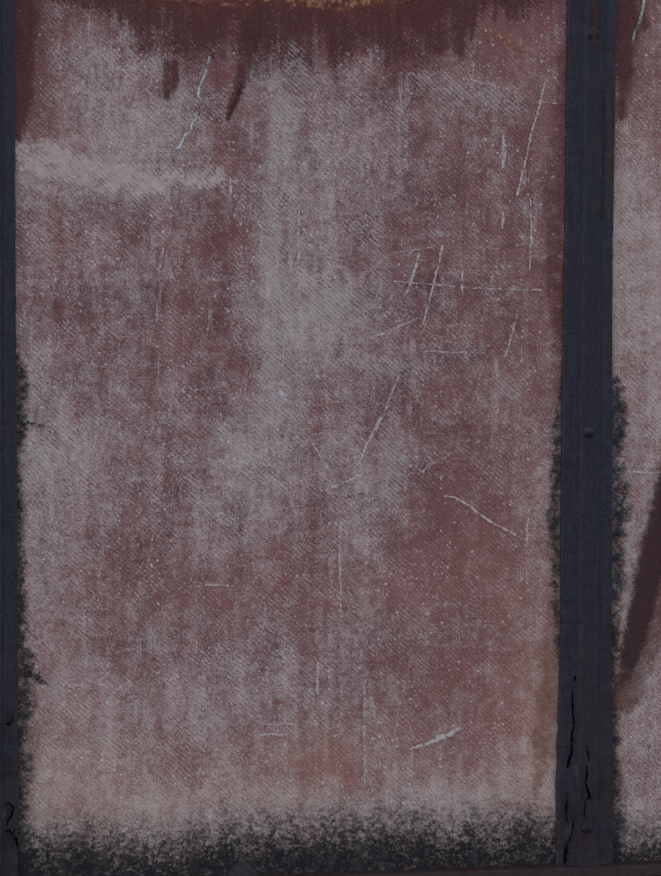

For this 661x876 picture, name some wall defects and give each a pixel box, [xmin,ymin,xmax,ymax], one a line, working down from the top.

corrosion [51,0,543,120]
damp [16,355,557,876]
damp [546,374,562,664]
damp [611,375,661,863]
crack [4,802,18,846]
crack [563,675,592,864]